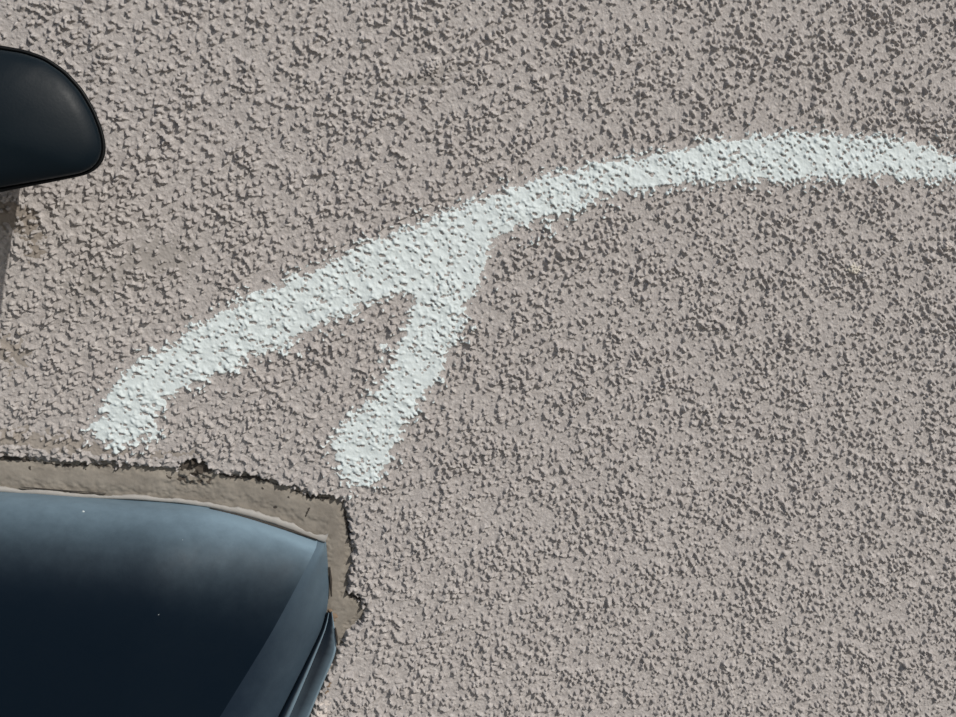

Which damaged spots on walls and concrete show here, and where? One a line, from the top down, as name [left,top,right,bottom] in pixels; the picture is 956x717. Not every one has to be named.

peeling [0,453,365,669]